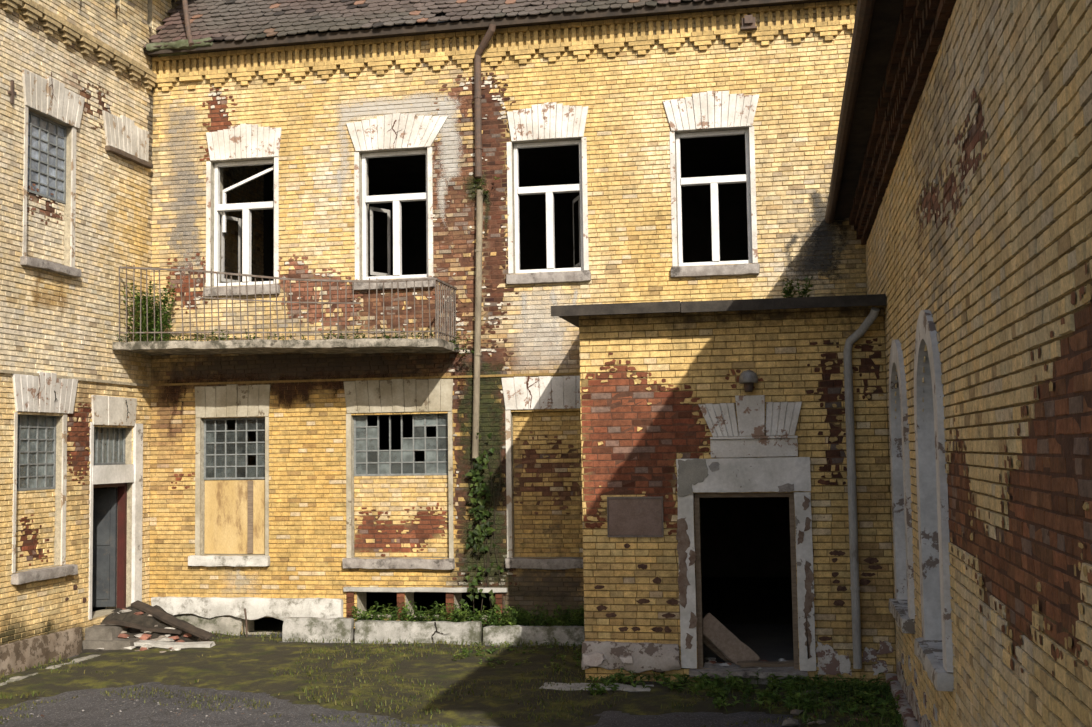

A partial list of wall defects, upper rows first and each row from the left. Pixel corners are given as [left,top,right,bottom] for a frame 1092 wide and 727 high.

spalling [199,88,238,161]
peeling [277,67,720,649]
spalling [67,403,92,485]
spalling [805,338,884,485]
spalling [945,264,1092,678]
spalling [19,514,49,566]
peeling [778,483,811,544]
spalling [829,550,847,606]
peeling [803,557,938,727]